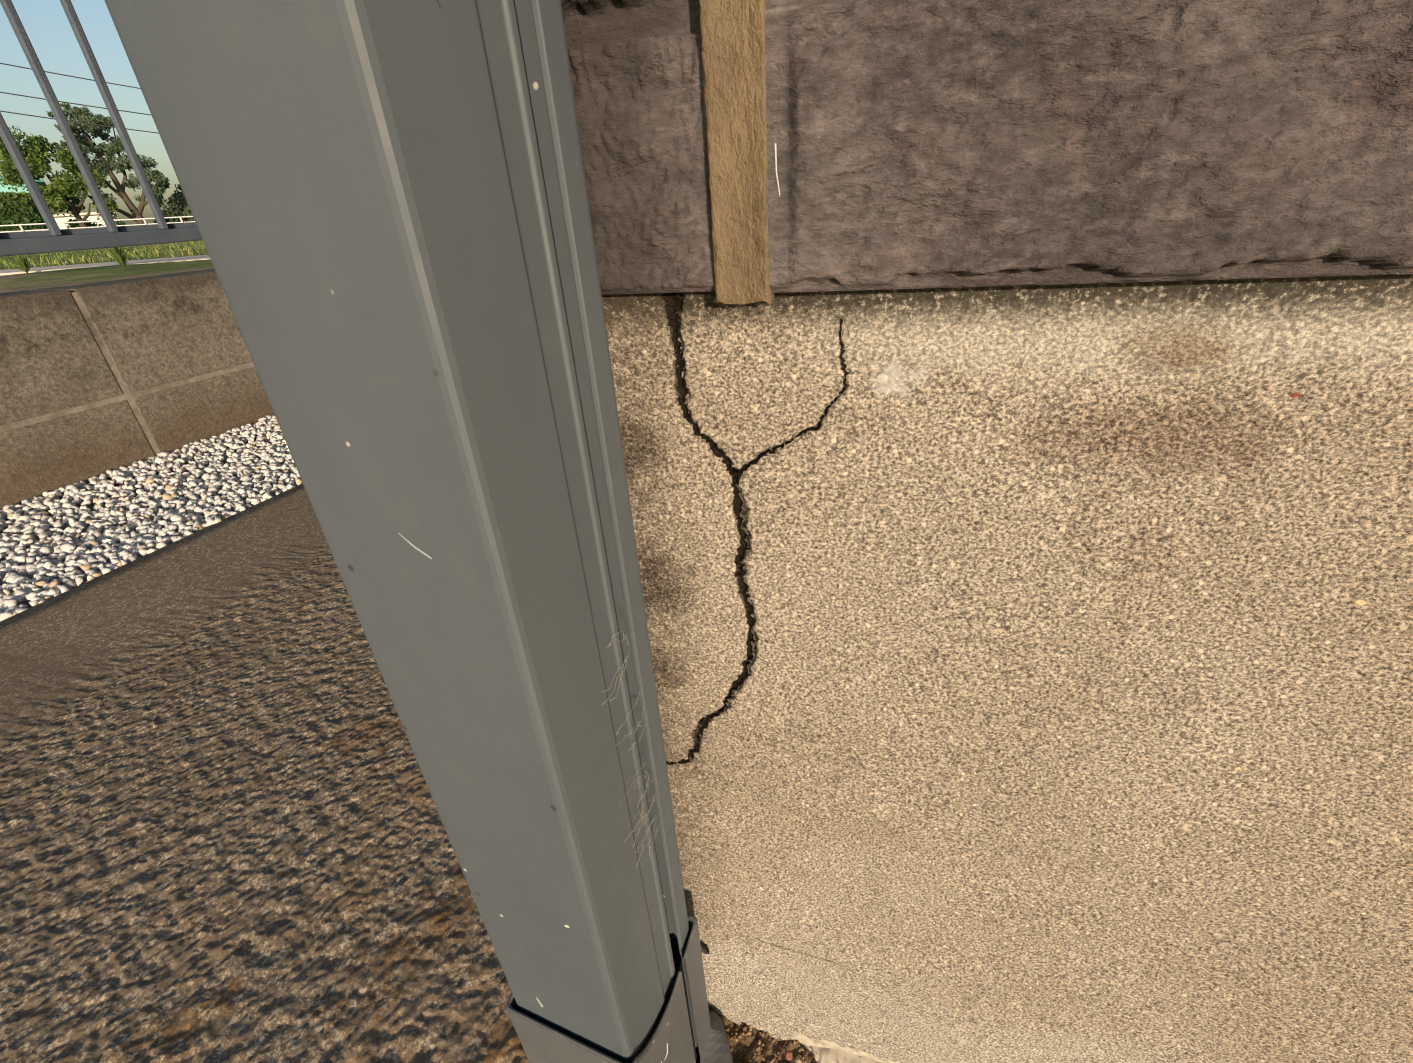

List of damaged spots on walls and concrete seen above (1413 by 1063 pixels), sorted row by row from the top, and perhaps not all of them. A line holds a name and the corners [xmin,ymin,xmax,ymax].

crack [662,293,849,765]